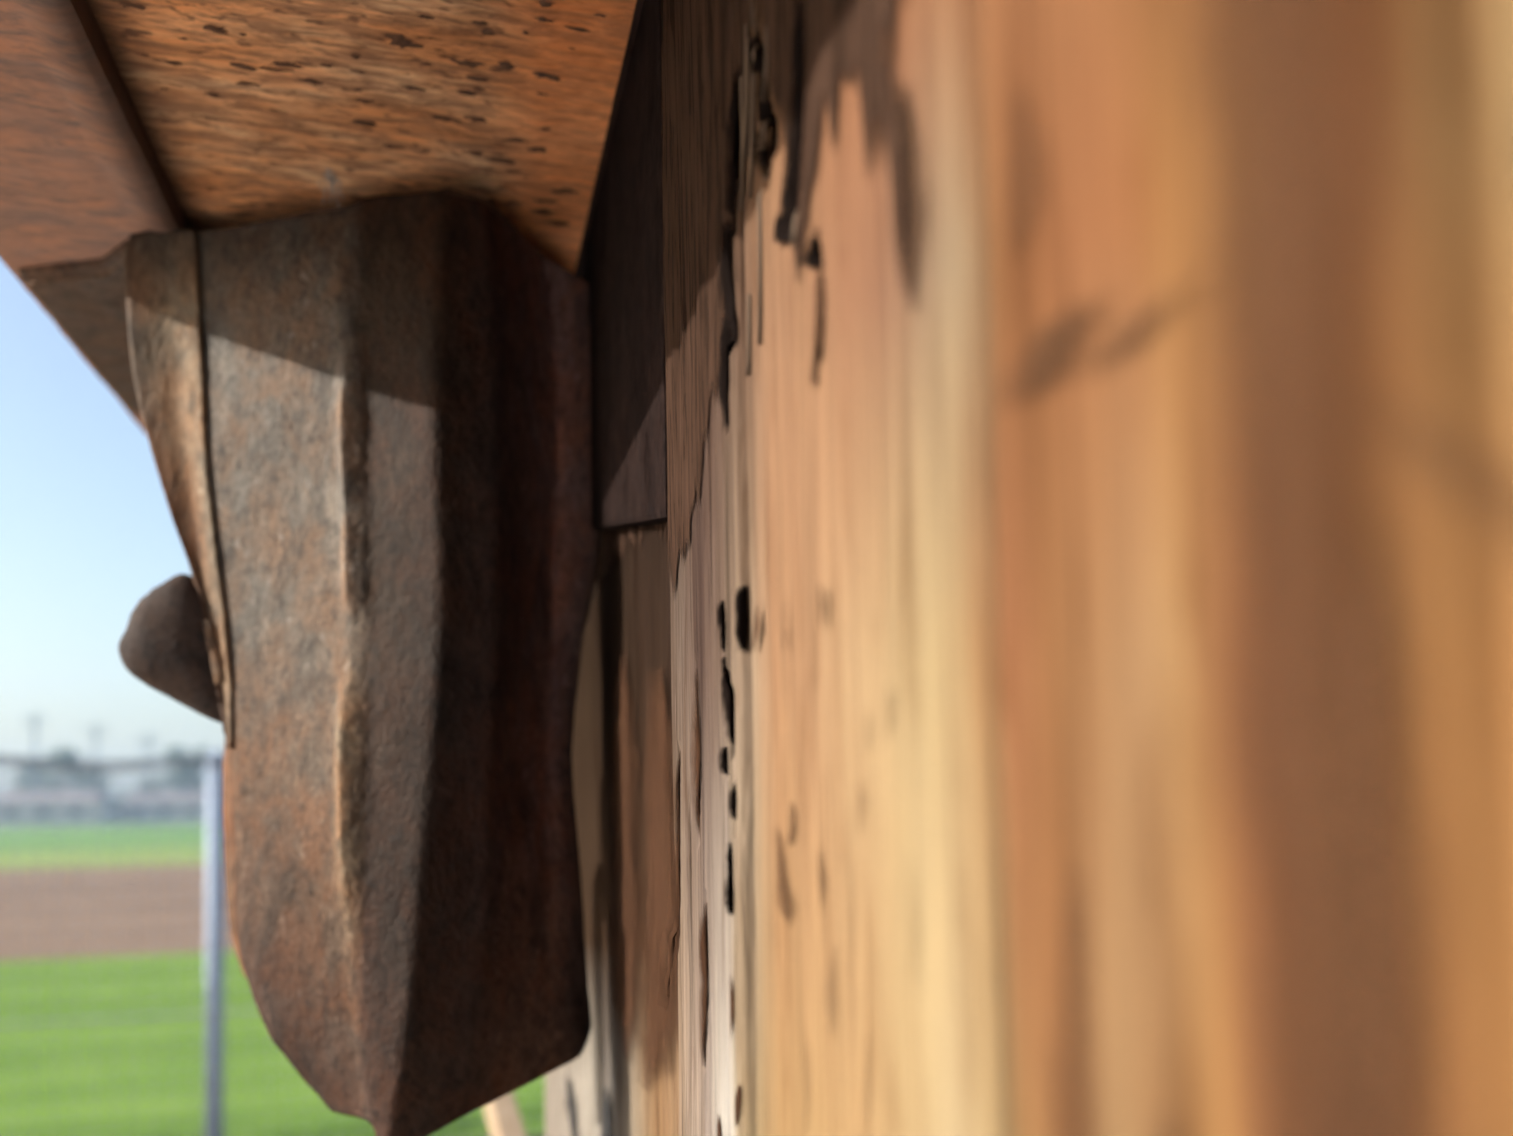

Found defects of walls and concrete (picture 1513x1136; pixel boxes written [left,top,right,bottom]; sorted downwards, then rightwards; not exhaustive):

peeling [593,0,916,594]